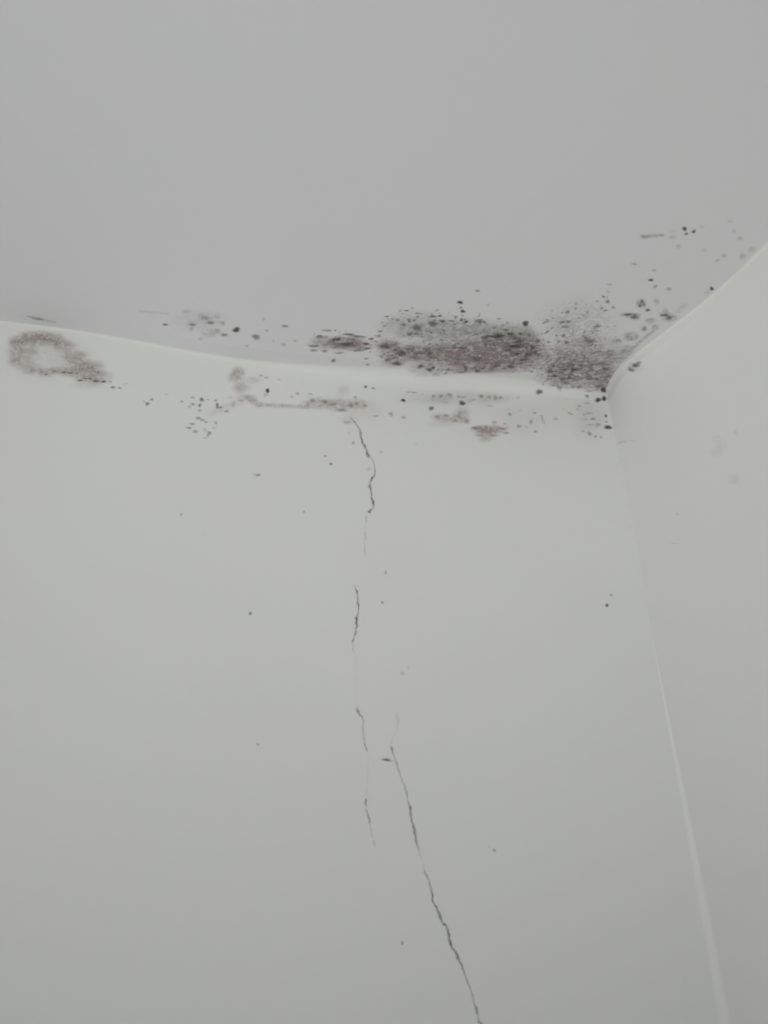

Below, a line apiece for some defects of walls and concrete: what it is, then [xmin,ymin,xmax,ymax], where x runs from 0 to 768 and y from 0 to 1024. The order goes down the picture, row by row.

leakage [331,301,540,372]